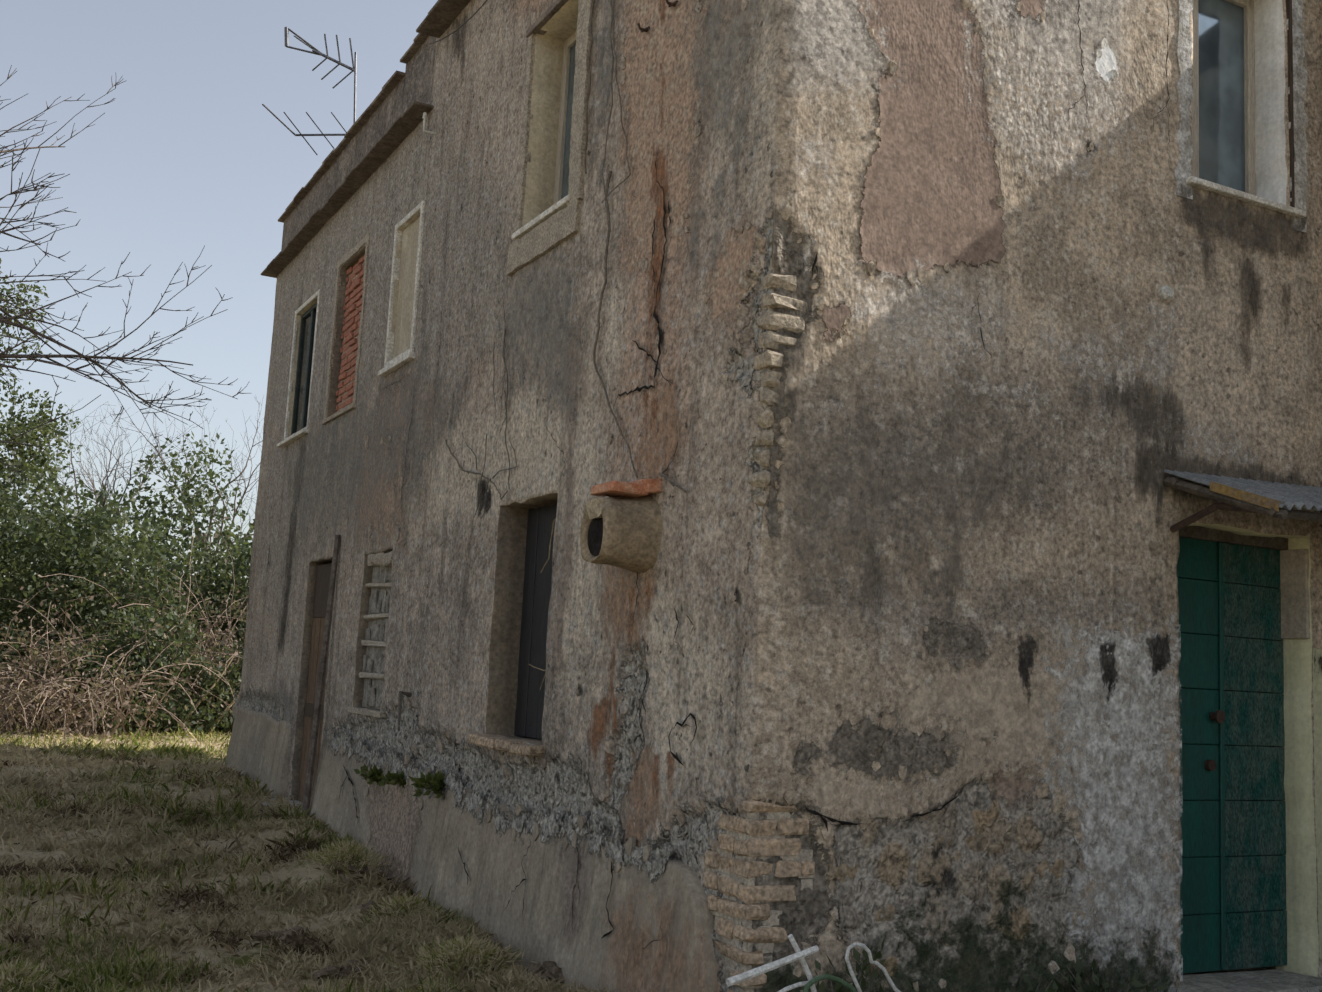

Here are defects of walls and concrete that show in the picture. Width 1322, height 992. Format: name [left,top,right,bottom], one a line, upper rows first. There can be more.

peeling [857,0,1006,286]
water stain [1181,187,1307,365]
flaking render [702,202,853,539]
water stain [1100,642,1118,700]
water stain [1147,632,1171,683]
flaking render [324,615,1183,992]
crack [805,806,862,832]
crack [903,790,962,837]